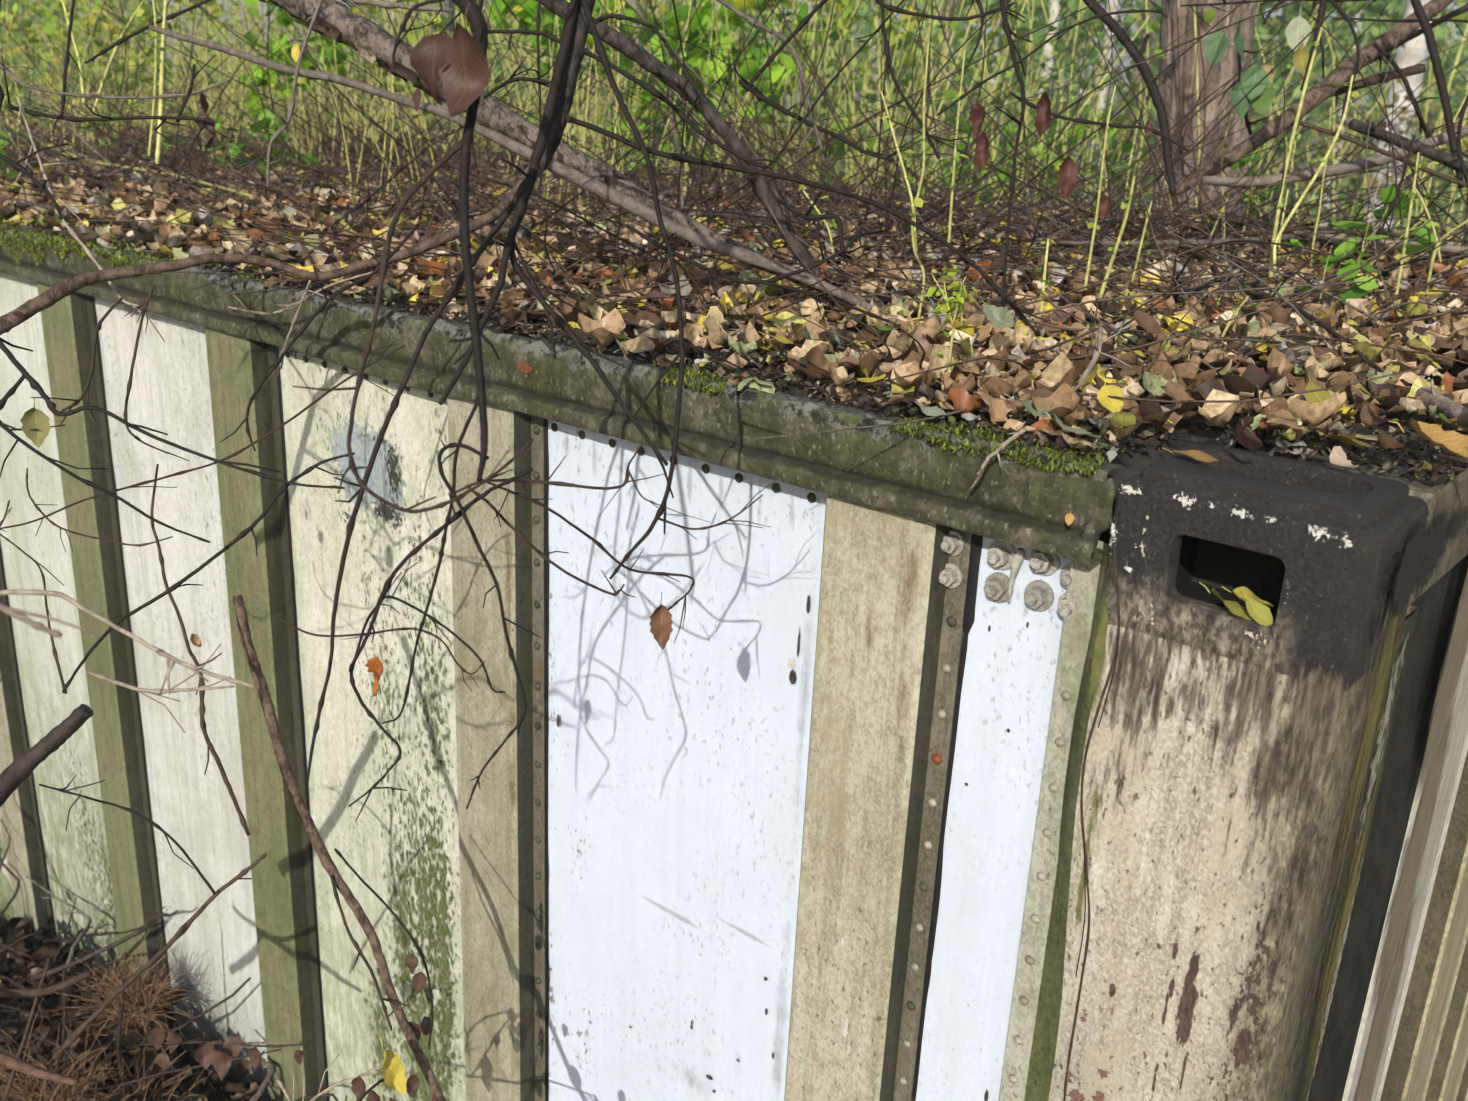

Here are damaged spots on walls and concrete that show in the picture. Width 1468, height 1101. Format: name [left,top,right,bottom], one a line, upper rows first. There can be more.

damp [351,525,460,1101]
corrosion [1062,1069,1109,1101]
damp [1101,505,1468,1101]